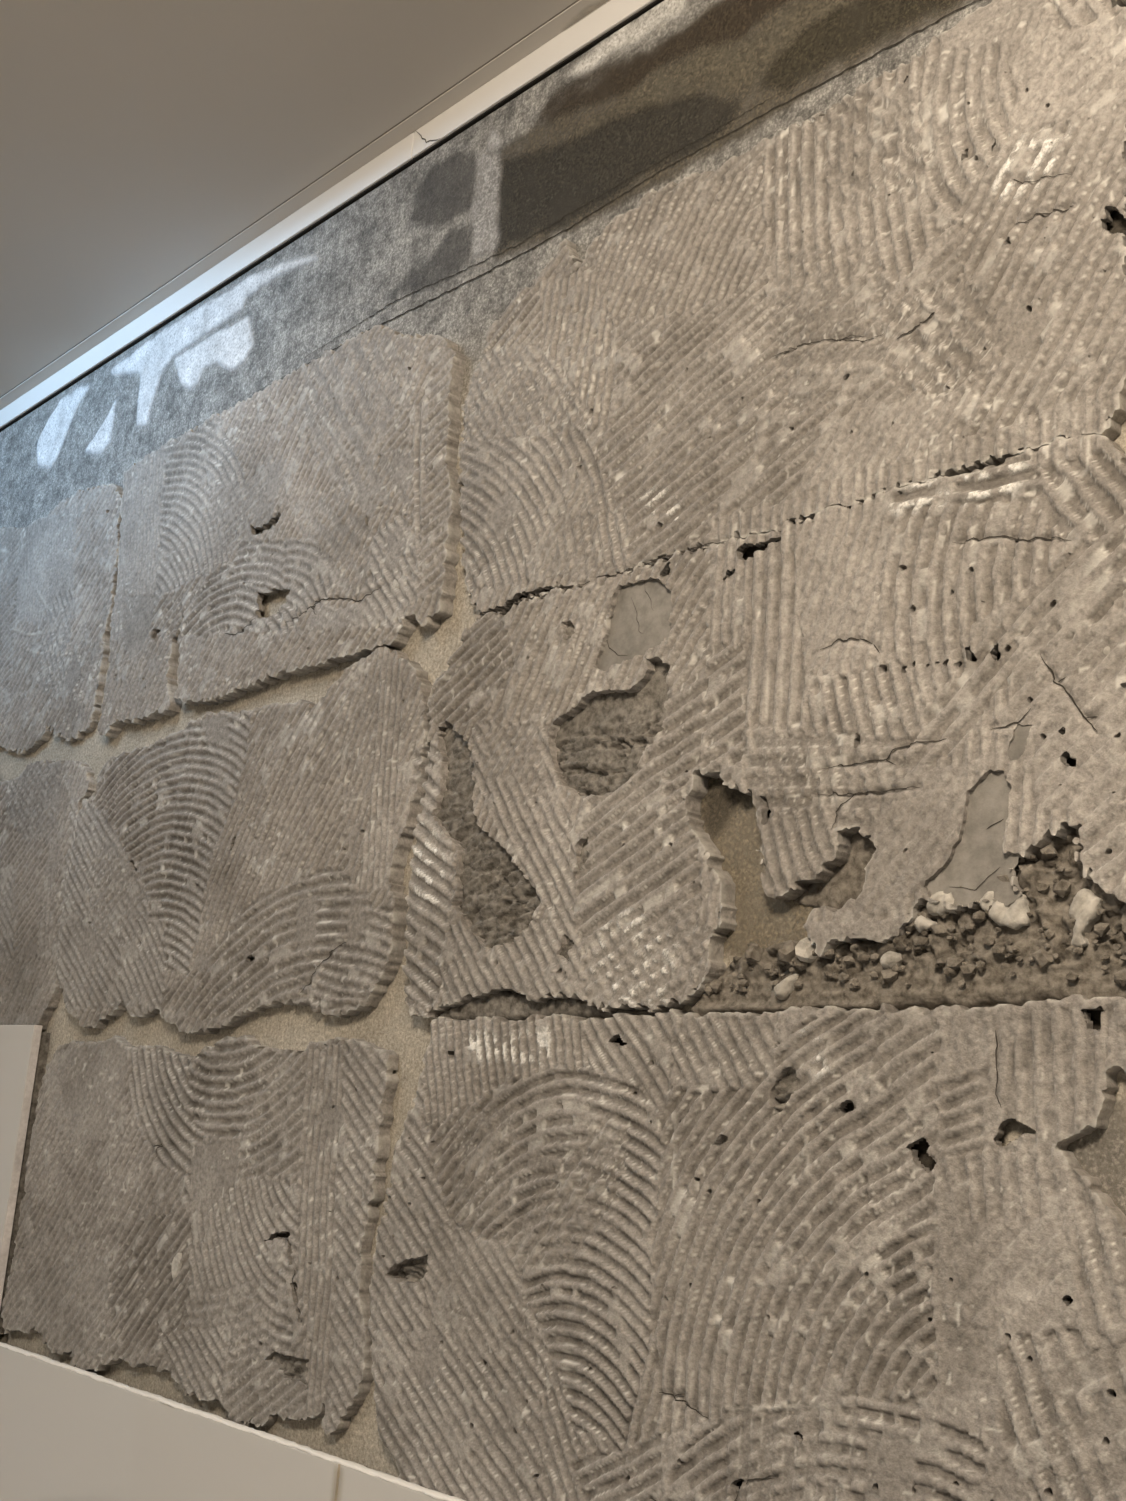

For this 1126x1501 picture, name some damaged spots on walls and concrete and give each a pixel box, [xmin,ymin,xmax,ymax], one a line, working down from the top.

spalling [0,325,1126,1435]